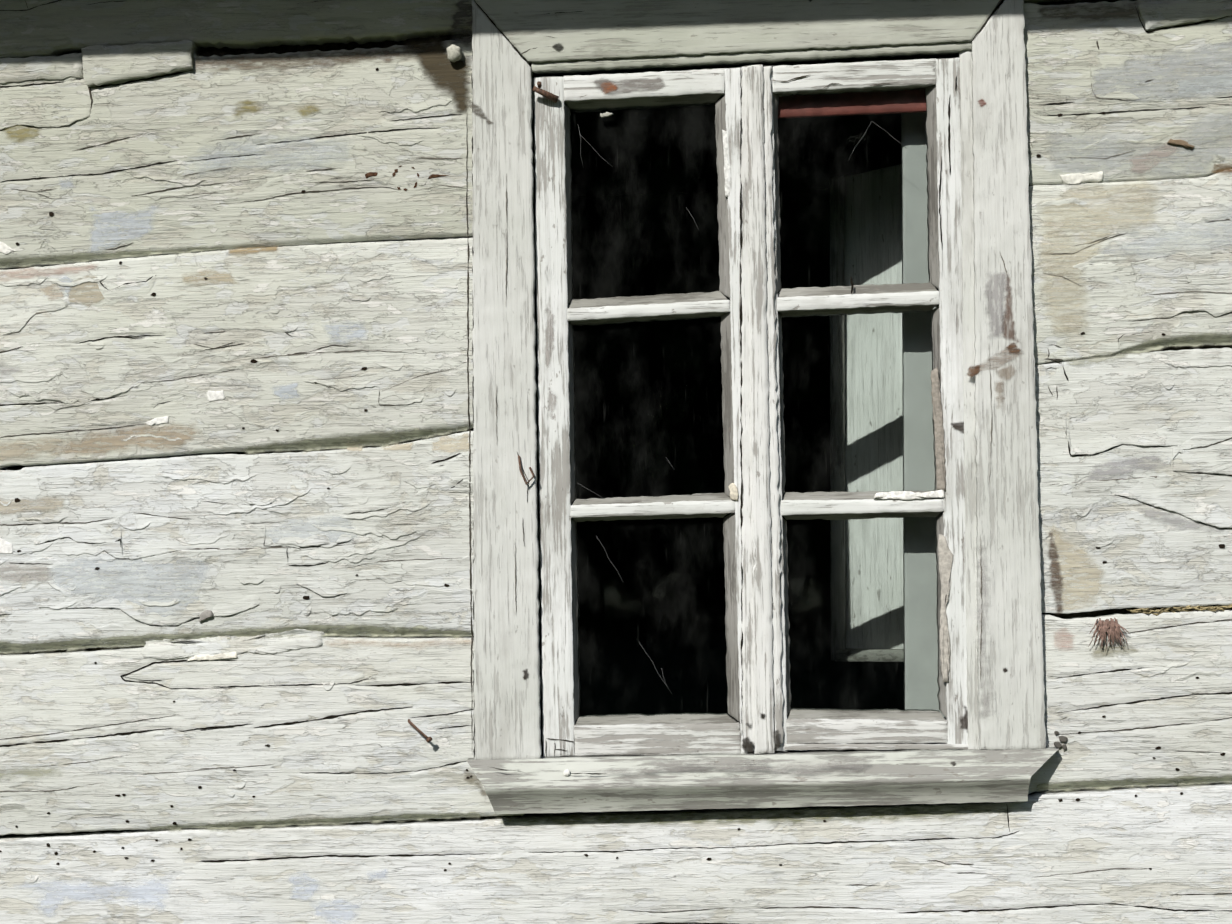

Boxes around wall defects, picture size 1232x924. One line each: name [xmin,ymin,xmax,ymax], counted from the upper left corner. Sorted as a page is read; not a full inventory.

water stain [405,39,468,112]
peeling [1089,62,1143,101]
peeling [1036,171,1103,211]
peeling [0,274,156,335]
rust [977,278,1021,392]
peeling [1118,296,1232,349]
peeling [0,369,142,410]
peeling [170,349,299,402]
peeling [121,416,188,446]
crack [0,114,529,792]
peeling [0,471,474,663]
peeling [0,802,33,814]